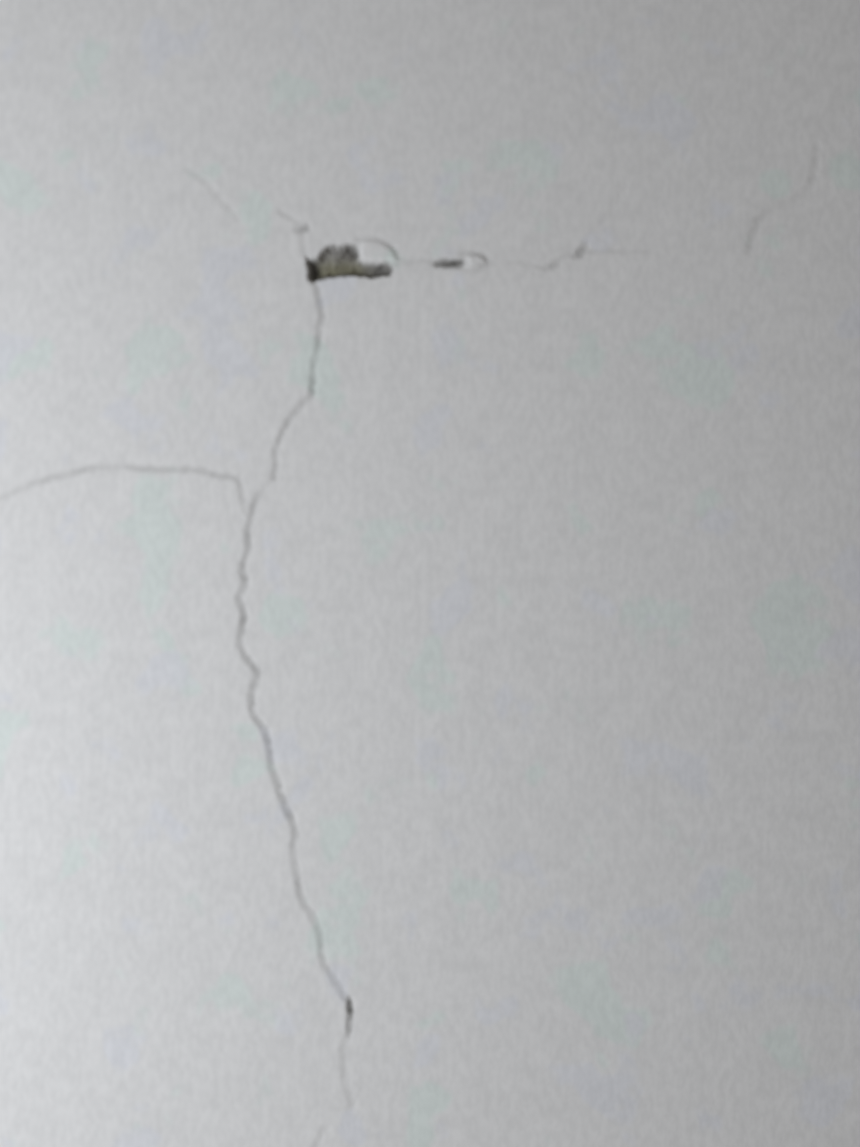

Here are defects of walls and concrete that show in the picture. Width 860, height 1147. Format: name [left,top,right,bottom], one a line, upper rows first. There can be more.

flaking render [303,230,406,287]
crack [398,178,660,277]
crack [0,204,359,1147]